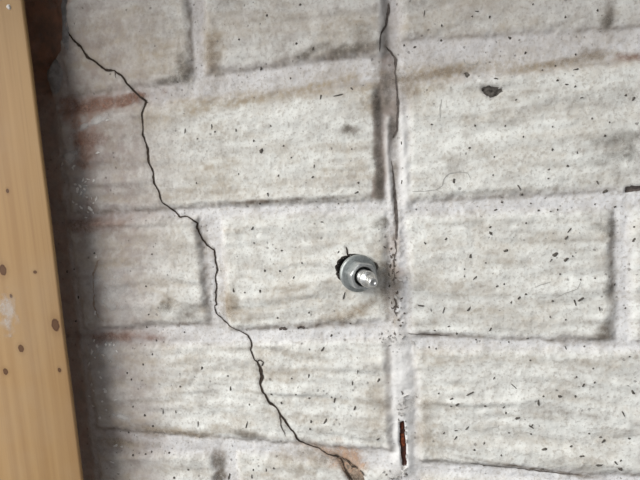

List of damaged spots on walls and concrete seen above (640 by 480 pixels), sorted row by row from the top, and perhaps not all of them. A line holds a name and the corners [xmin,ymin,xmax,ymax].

crack [379,3,399,138]
crack [68,32,359,480]
crack [390,162,398,278]
rust [398,421,408,469]